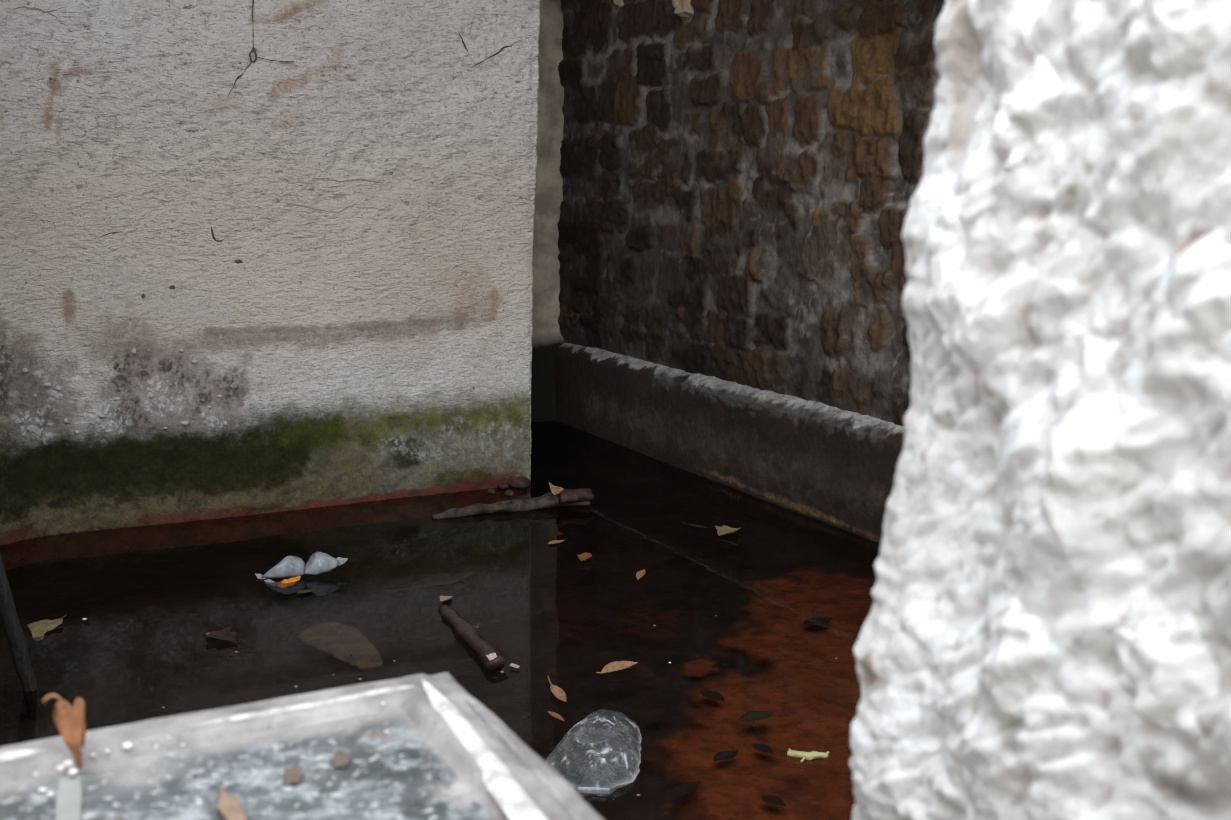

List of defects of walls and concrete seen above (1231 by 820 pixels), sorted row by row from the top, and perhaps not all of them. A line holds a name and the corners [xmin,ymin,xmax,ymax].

peeling [672,0,694,17]
water stain [0,331,56,447]
water stain [0,418,340,509]
water stain [392,440,419,468]